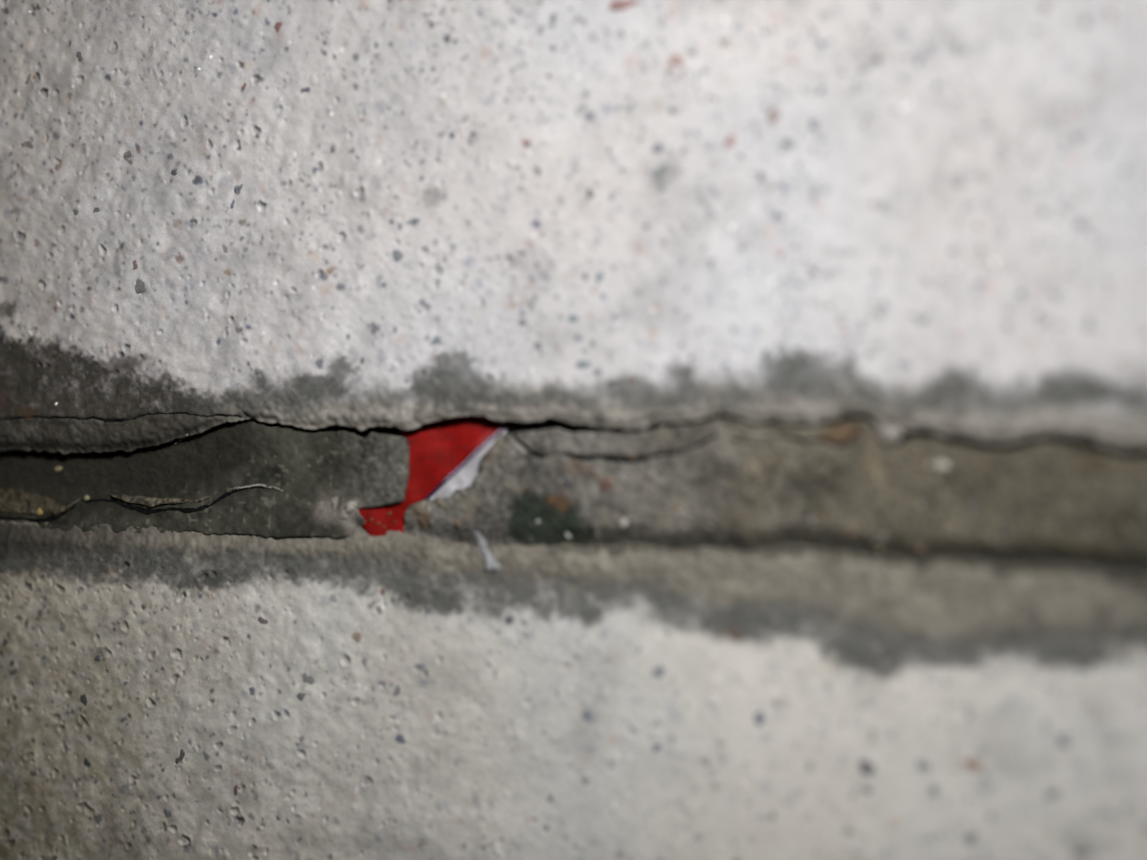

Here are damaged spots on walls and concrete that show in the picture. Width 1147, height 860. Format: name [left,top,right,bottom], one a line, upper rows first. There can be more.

damp [0,304,367,453]
damp [414,346,1147,413]
crack [0,411,399,438]
crack [507,413,1147,463]
crack [0,490,239,522]
spalling [314,496,357,520]
damp [0,524,1147,678]